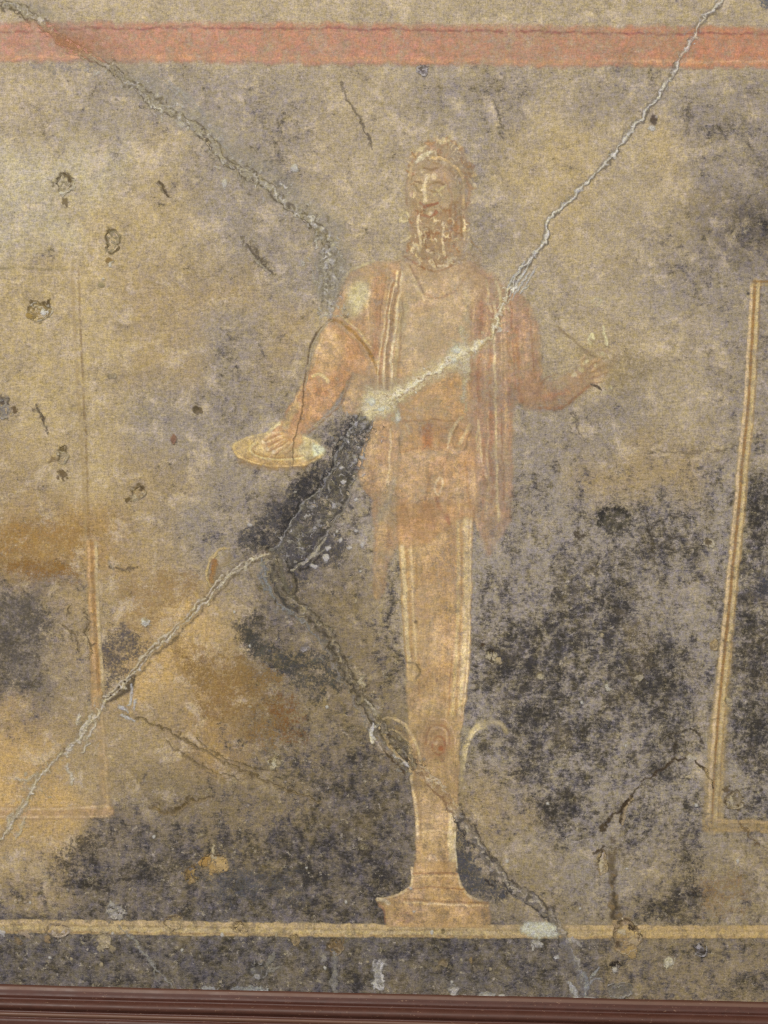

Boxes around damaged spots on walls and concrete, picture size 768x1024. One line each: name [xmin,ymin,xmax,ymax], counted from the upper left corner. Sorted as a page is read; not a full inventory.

spalling [55,172,75,207]
crack [0,0,351,441]
crack [361,0,723,421]
spalling [26,299,53,322]
spalling [266,413,384,571]
damp [597,507,631,533]
damp [101,626,147,688]
damp [233,610,348,706]
crack [0,547,600,998]
crack [605,728,714,825]
damp [455,825,507,901]
spalling [593,823,643,999]